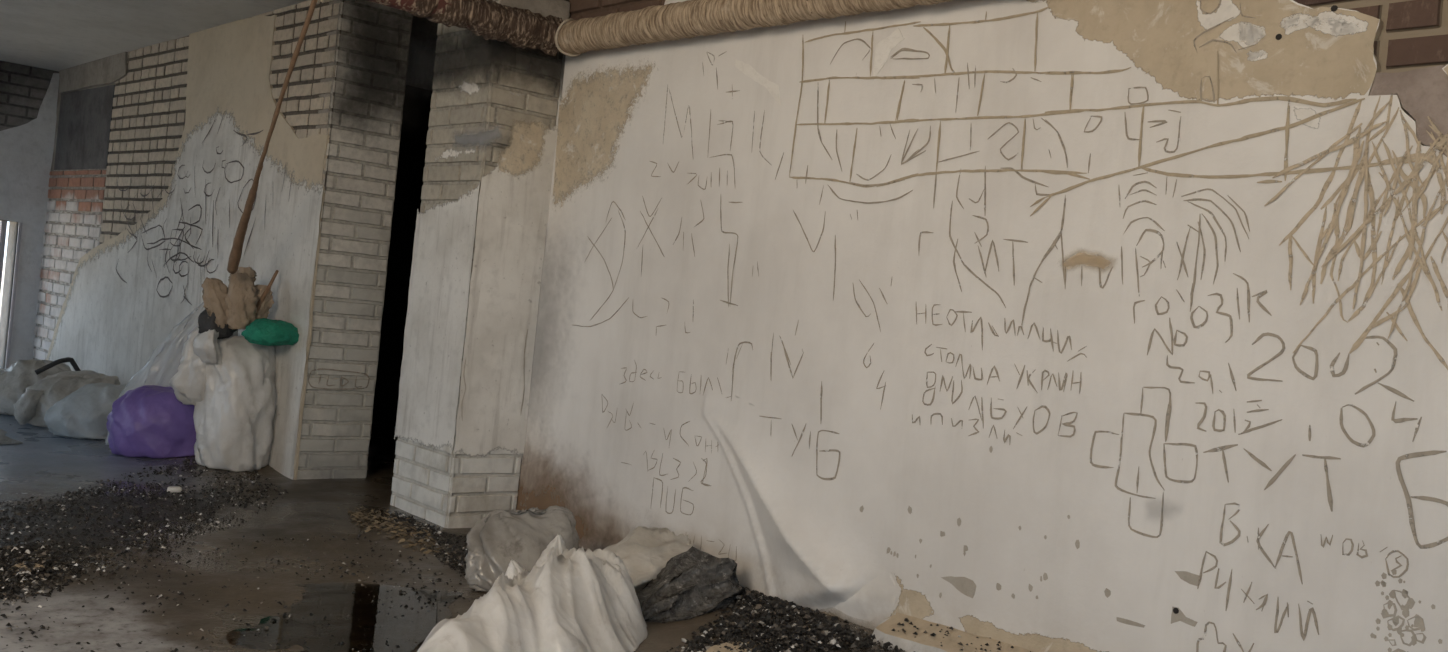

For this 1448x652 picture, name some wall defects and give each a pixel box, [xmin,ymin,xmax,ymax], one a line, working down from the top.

peeling [1027,0,1448,157]
peeling [498,66,655,206]
peeling [887,539,976,619]
spalling [996,572,1048,599]
peeling [959,615,1109,652]
spalling [1370,570,1442,652]